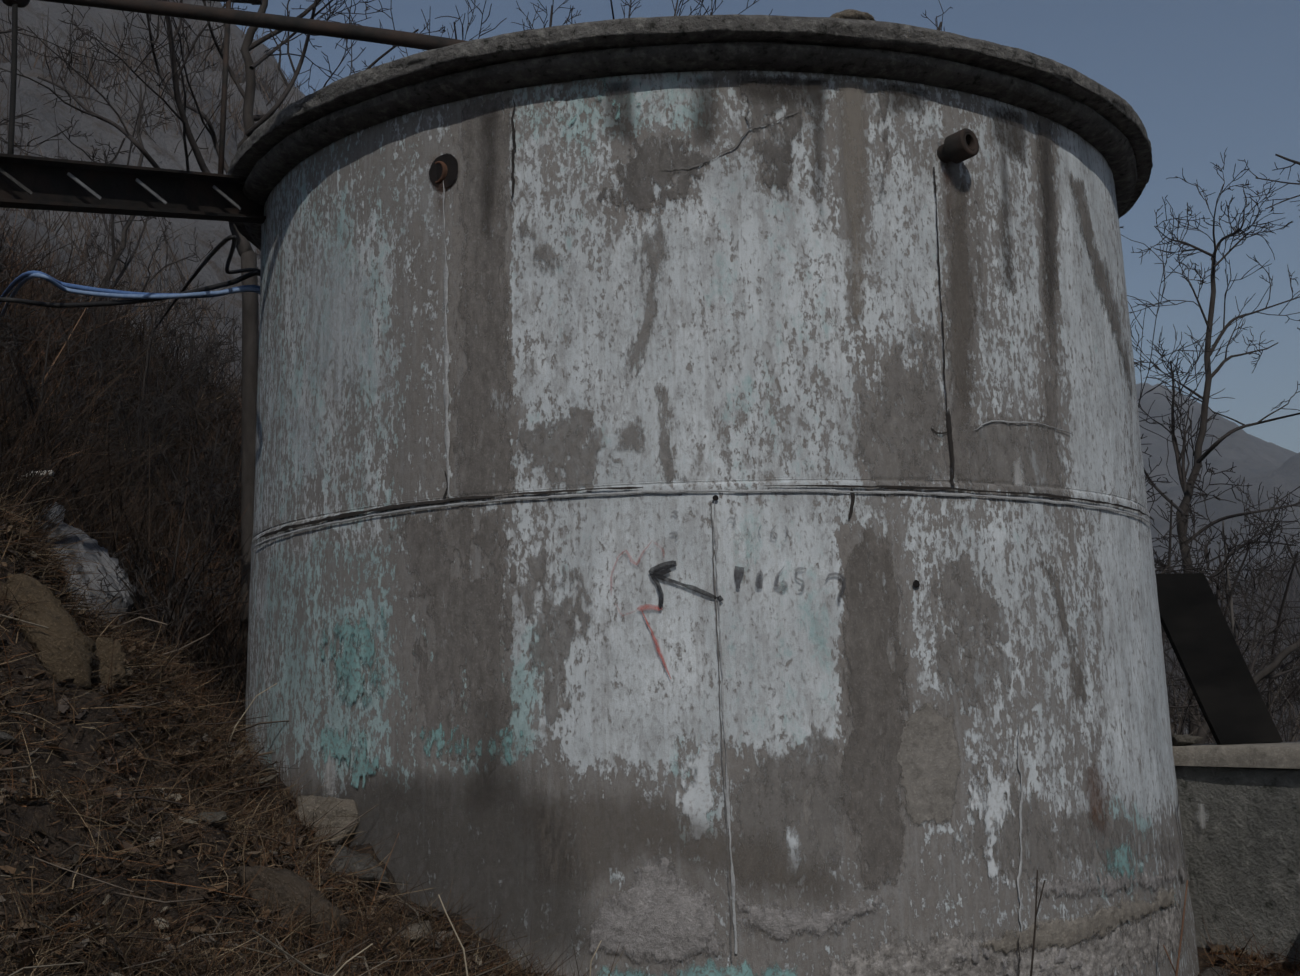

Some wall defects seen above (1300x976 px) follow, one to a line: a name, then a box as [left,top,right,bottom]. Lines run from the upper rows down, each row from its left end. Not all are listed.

water stain [610,82,631,136]
peeling [738,72,813,197]
water stain [741,77,823,128]
peeling [876,81,890,202]
peeling [597,132,711,382]
crack [768,167,1151,519]
peeling [854,117,1070,508]
peeling [1070,173,1132,398]
peeling [734,524,910,889]
peeling [928,553,1022,718]
peeling [1042,561,1091,706]
spalling [820,759,1190,976]